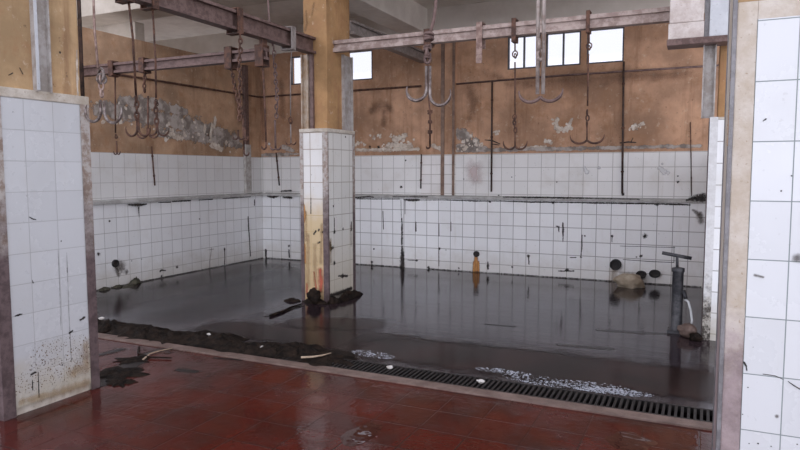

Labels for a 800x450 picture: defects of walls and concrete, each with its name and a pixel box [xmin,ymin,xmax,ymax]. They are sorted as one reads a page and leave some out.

peeling [89,95,243,153]
peeling [355,133,420,152]
peeling [456,117,702,153]